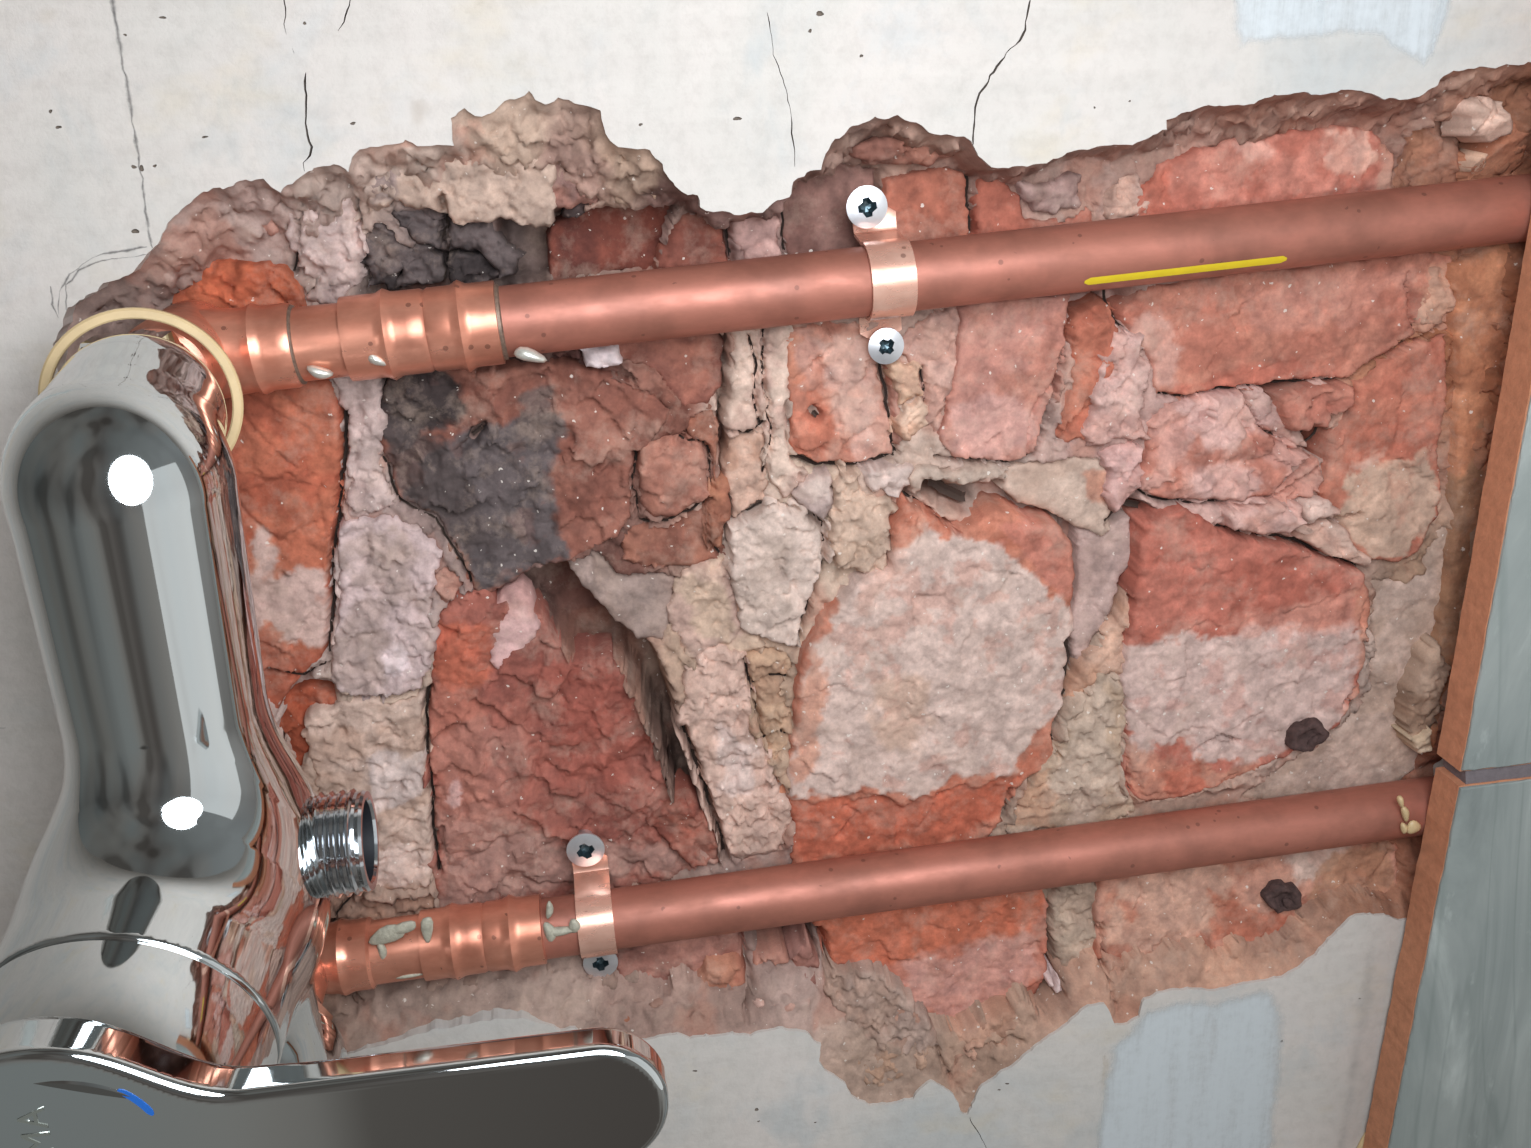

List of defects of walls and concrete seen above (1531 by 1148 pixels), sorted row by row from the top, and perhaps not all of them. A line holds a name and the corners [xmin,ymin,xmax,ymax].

crack [767,13,795,164]
spalling [66,62,1531,362]
crack [972,0,1031,145]
spalling [225,241,1526,922]
spalling [323,836,1423,1113]